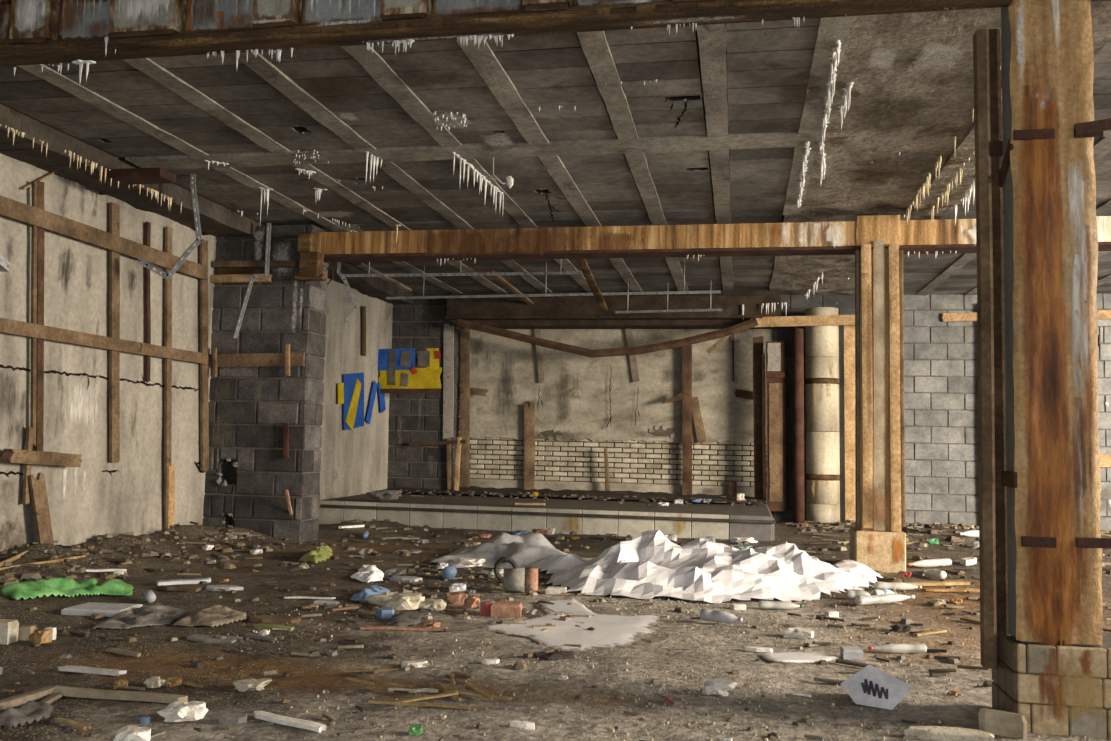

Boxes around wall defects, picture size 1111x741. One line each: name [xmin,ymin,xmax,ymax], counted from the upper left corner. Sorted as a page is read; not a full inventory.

crack [0,364,199,392]
rust [1021,78,1094,718]
crack [0,470,24,478]